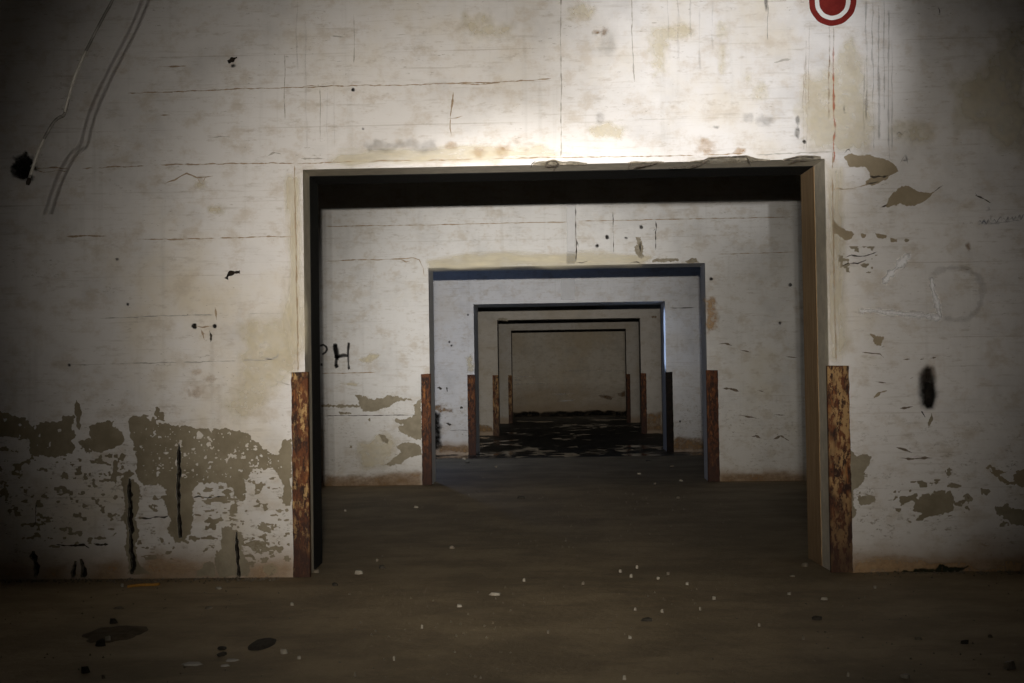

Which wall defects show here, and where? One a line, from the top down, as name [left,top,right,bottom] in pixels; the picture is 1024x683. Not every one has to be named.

peeling [844,153,898,186]
peeling [885,186,934,208]
peeling [832,220,909,273]
peeling [321,395,422,466]
peeling [0,400,292,577]
peeling [851,451,876,519]
peeling [893,468,991,523]
peeling [986,465,1024,488]
peeling [995,503,1024,527]